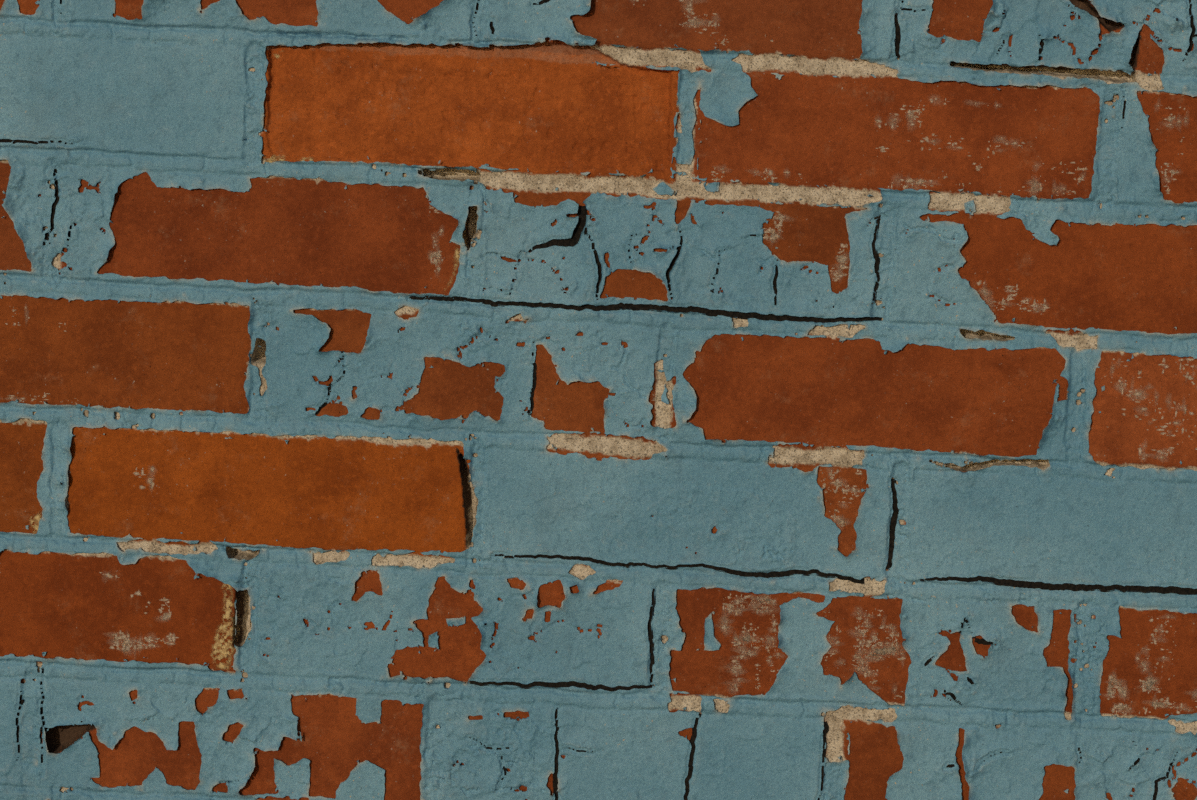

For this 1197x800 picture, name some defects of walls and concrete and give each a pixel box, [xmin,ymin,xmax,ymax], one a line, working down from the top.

peeling [0,0,54,25]
spalling [107,0,1197,567]
peeling [0,150,495,800]
peeling [501,560,635,631]
peeling [460,703,540,732]
peeling [657,569,921,800]
peeling [928,624,1000,681]
peeling [538,762,568,800]
peeling [947,718,977,800]